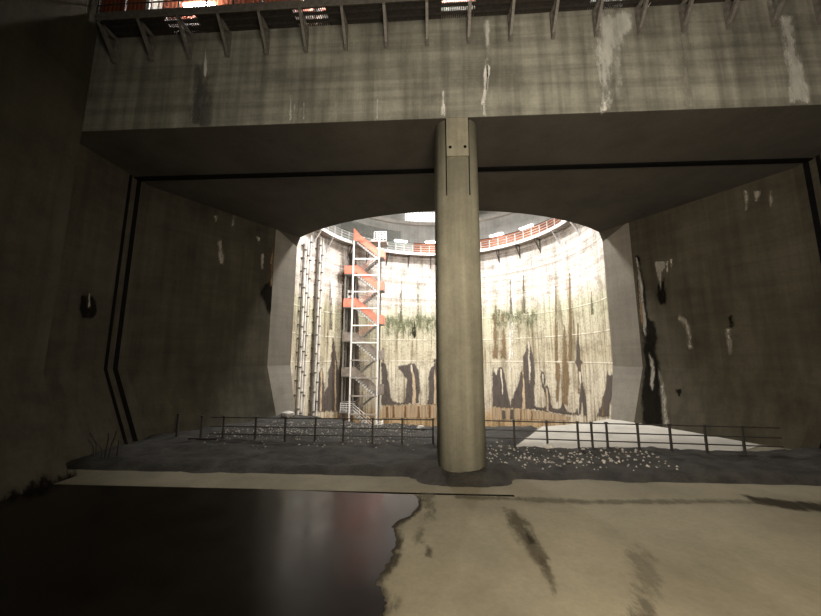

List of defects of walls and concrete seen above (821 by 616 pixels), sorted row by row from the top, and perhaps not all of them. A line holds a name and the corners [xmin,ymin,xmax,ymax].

leakage [596,11,632,111]
leakage [315,251,360,412]
leakage [388,282,429,338]
leakage [381,349,437,405]
leakage [492,238,587,415]
leakage [597,363,613,417]